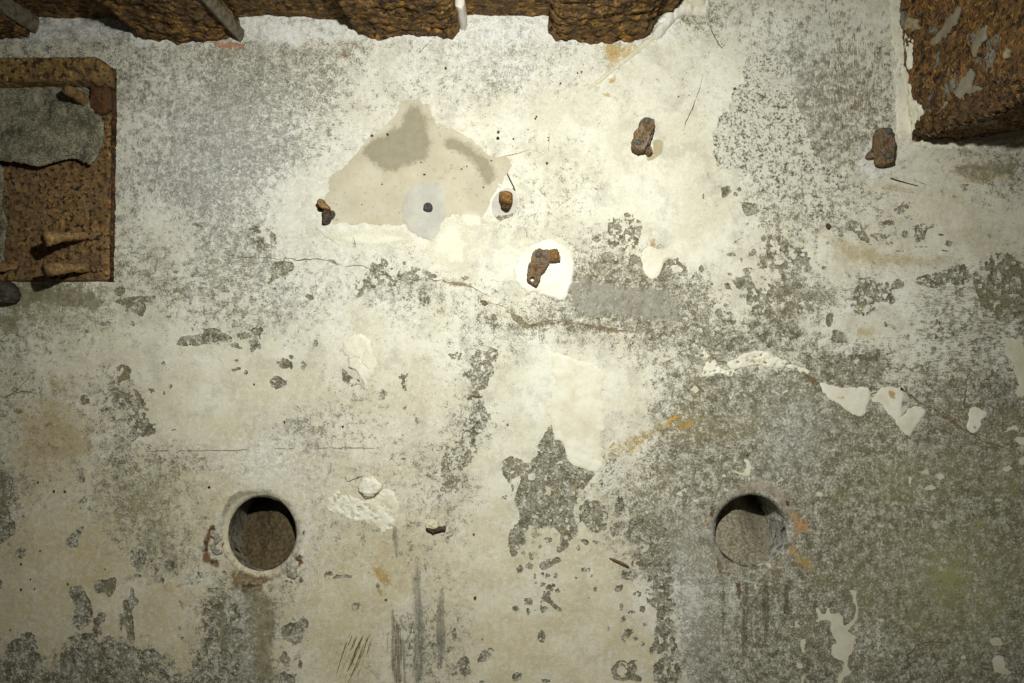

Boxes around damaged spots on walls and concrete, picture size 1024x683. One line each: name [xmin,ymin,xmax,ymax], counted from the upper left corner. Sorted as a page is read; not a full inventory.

water stain [364,109,429,170]
water stain [447,139,494,183]
peeling [480,300,498,330]
peeling [176,327,263,385]
peeling [270,355,307,389]
peeling [437,347,498,504]
rust [202,525,267,592]
peeling [502,425,682,683]